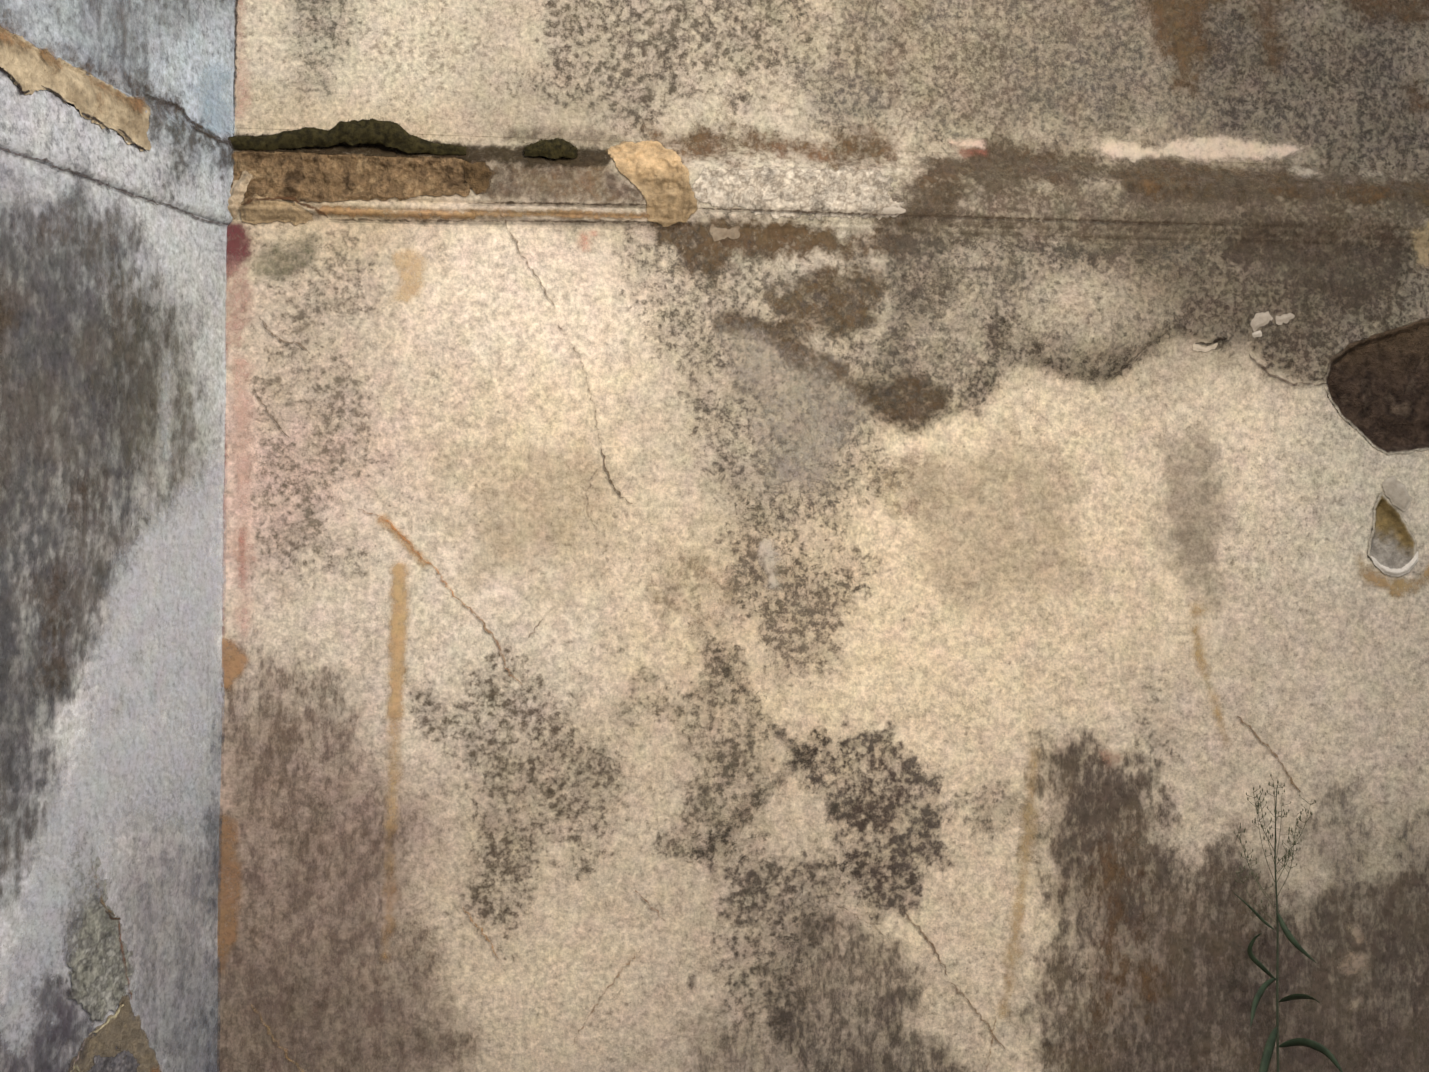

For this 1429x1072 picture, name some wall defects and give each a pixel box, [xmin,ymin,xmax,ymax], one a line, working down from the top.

flaking render [0,25,151,152]
flaking render [228,149,496,226]
crack [330,201,645,504]
damp [69,0,1429,684]
flaking render [1324,318,1429,455]
damp [0,165,472,1072]
rust [378,516,426,746]
crack [358,509,540,685]
flaking render [1368,476,1419,577]
flaking render [64,829,161,1072]
damp [410,649,620,960]
damp [624,638,1429,1072]